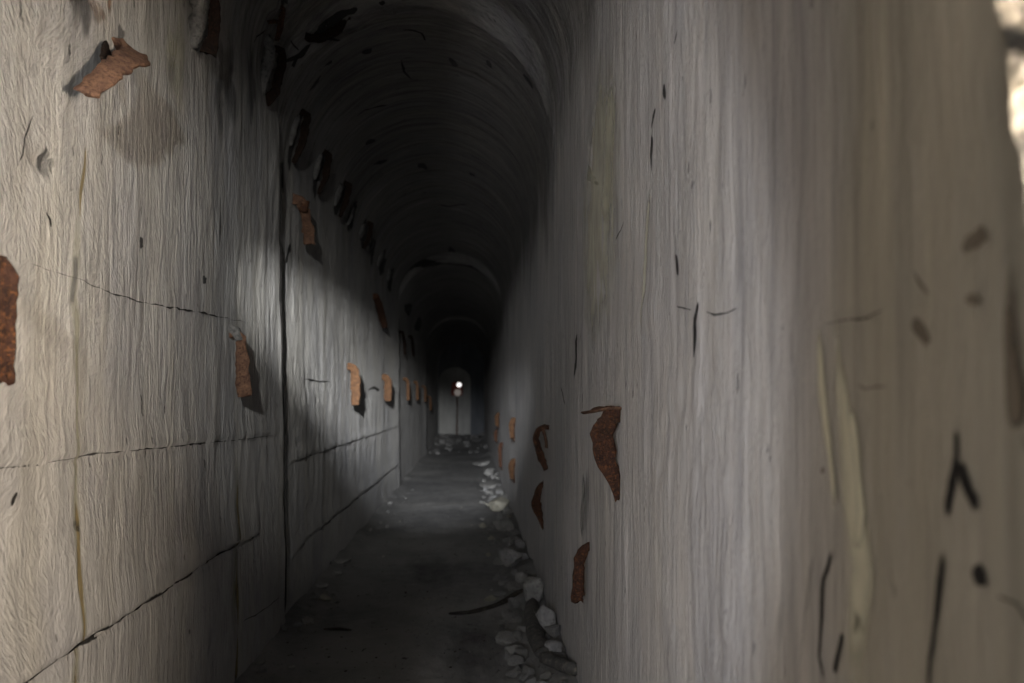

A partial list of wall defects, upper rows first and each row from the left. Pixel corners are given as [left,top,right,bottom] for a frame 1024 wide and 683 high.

crack [0,435,272,506]
crack [944,431,978,515]
crack [26,534,258,683]
crack [927,555,945,683]
crack [972,563,1024,616]